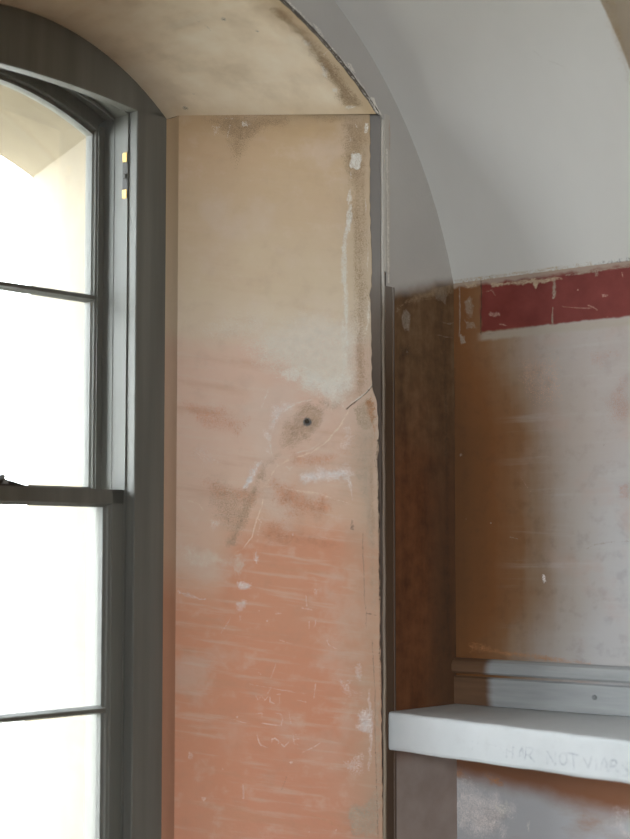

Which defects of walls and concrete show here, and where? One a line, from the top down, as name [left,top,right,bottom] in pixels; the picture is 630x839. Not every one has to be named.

damp [266,7,370,396]
peeling [488,264,630,326]
damp [181,389,341,590]